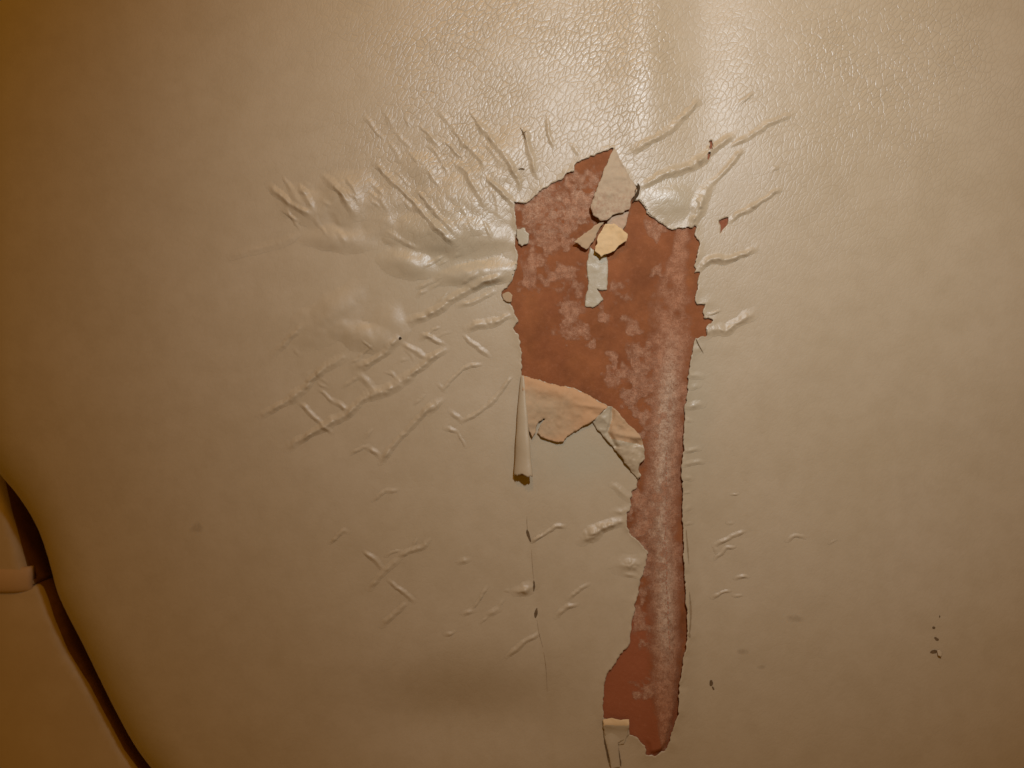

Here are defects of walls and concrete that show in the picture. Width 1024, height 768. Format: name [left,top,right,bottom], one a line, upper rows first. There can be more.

peeling [501,148,713,768]